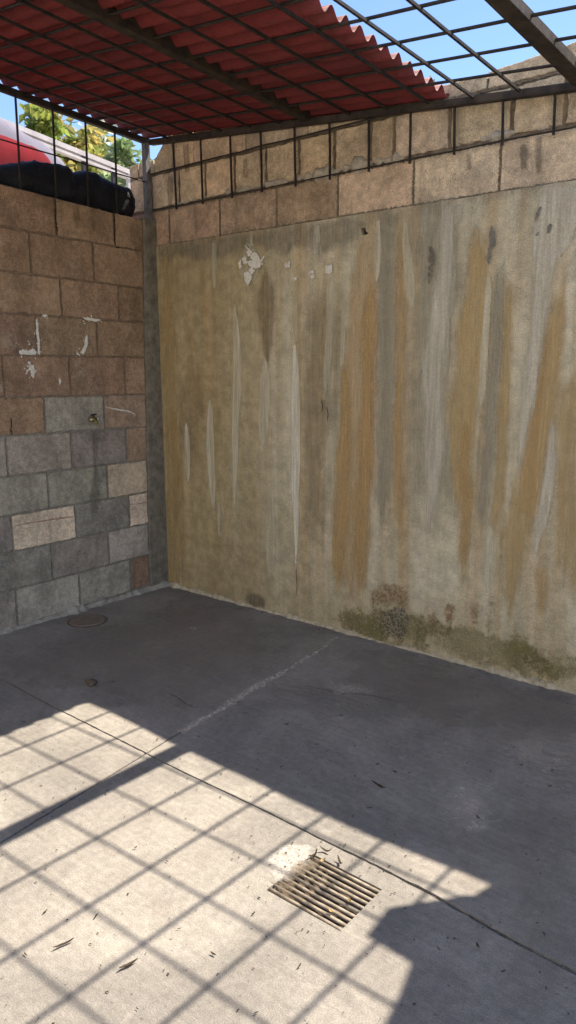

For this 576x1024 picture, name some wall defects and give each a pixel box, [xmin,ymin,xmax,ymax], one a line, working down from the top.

peeling [19,314,48,378]
peeling [76,315,102,356]
damp [206,399,220,524]
damp [232,306,242,505]
peeling [238,244,264,286]
damp [291,342,300,567]
corrosion [449,237,487,560]
corrosion [493,287,563,609]